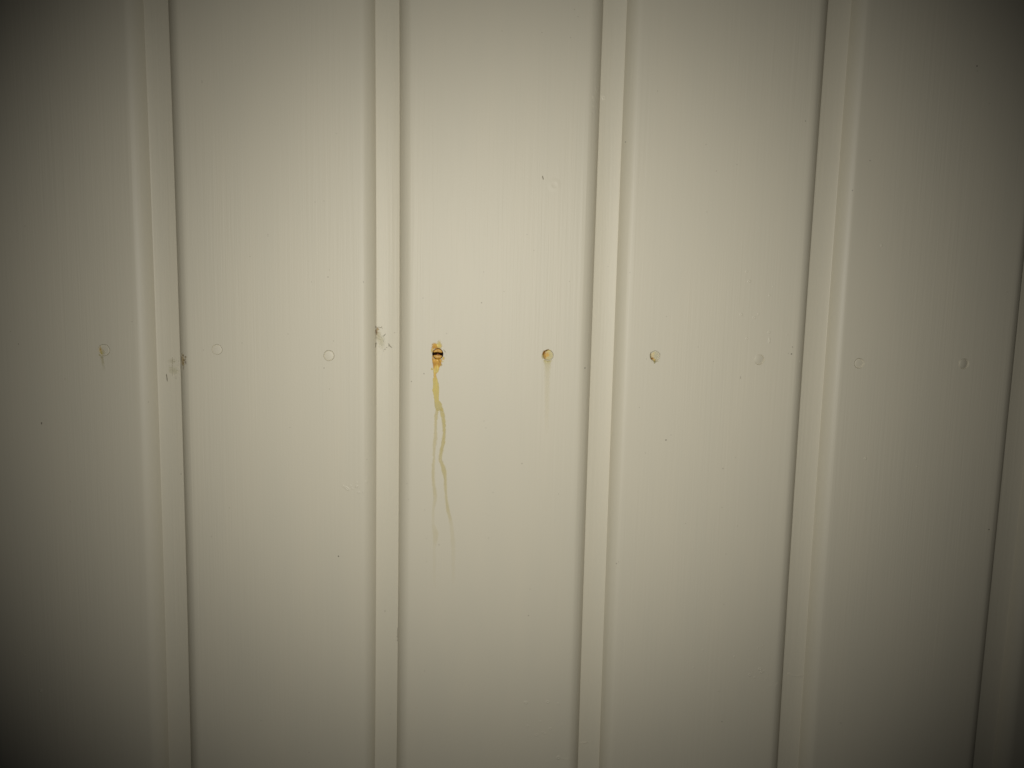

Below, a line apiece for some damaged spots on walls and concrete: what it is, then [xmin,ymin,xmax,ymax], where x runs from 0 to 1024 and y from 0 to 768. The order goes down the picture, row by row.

rust [431,342,445,427]